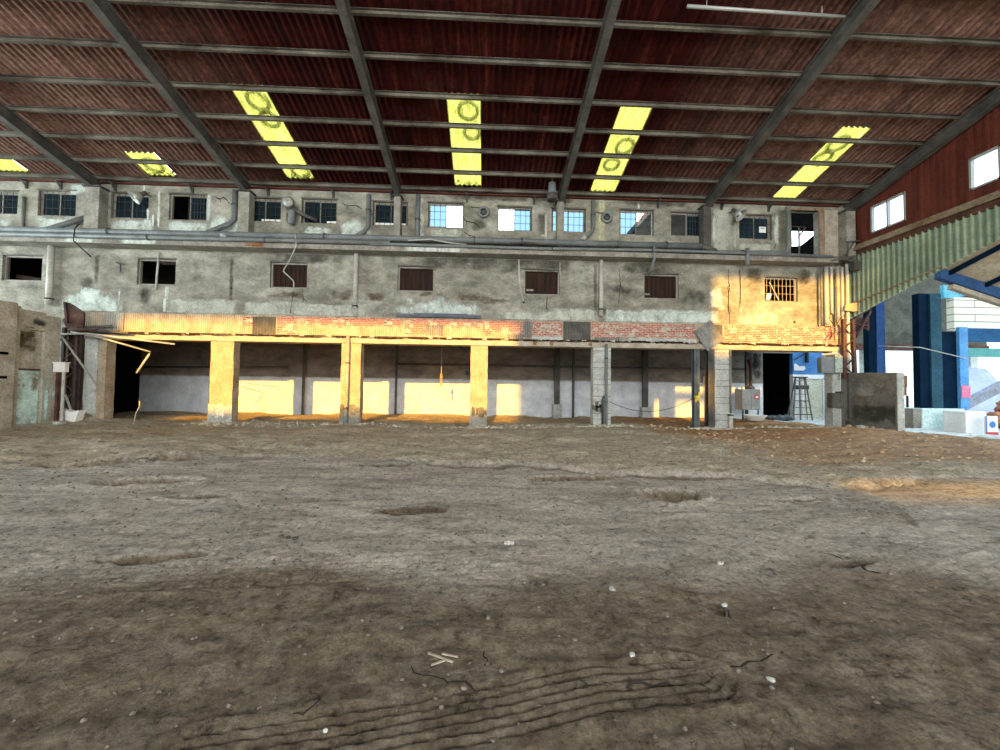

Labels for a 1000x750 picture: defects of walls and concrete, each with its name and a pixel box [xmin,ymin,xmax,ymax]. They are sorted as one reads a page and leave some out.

flaking render [106,316,696,344]